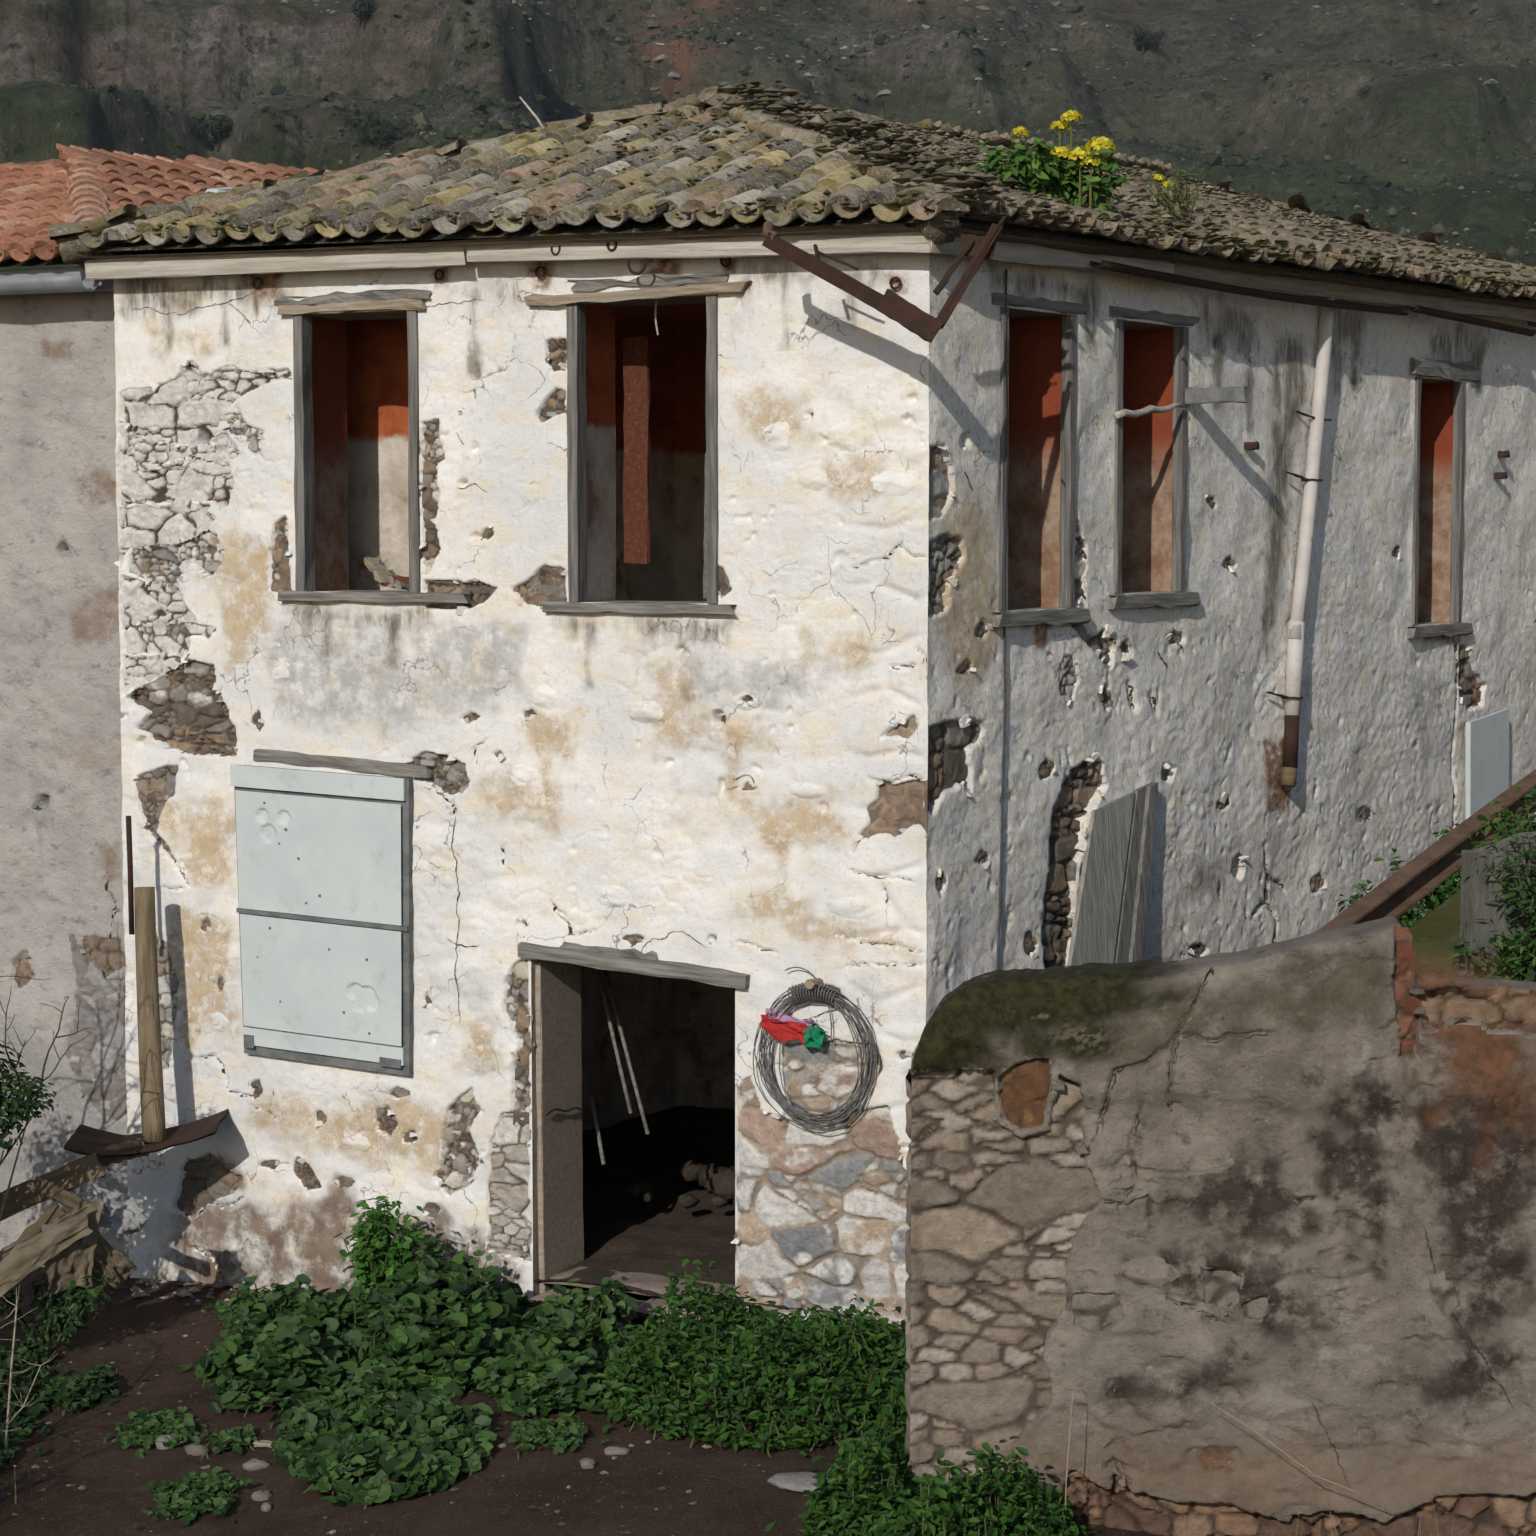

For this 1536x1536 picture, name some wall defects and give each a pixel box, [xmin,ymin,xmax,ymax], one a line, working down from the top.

spalling [114,360,293,861]
spalling [928,446,967,617]
leakage [1263,339,1305,649]
crack [553,904,588,935]
crack [641,931,773,952]
spalling [852,714,981,842]
spalling [1024,752,1104,968]
crack [1085,967,1273,1205]
spalling [731,1039,1124,1488]
leakage [1160,1252,1321,1334]
leakage [1190,1160,1318,1240]
leakage [1414,1095,1536,1399]